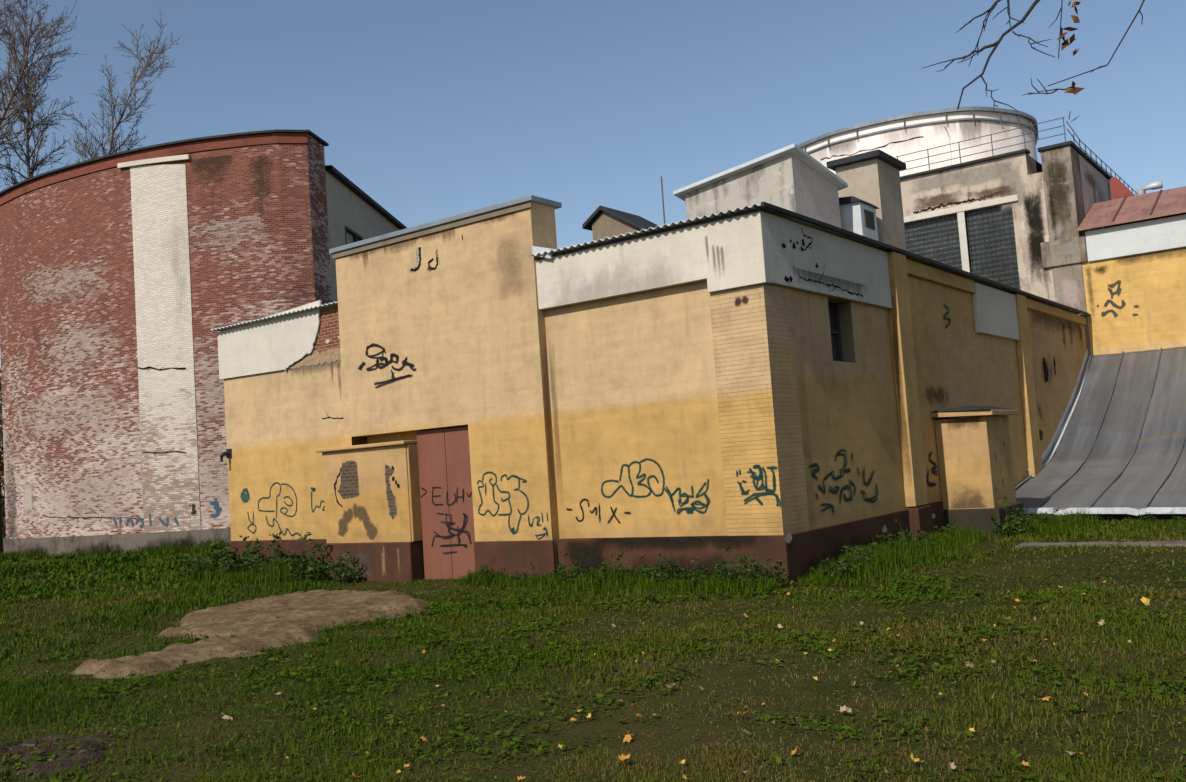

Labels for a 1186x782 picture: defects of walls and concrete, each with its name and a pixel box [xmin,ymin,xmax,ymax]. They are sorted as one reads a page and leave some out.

water stain [1025,164,1069,268]
crack [800,227,863,297]
crack [138,364,185,372]
flaking render [282,300,341,372]